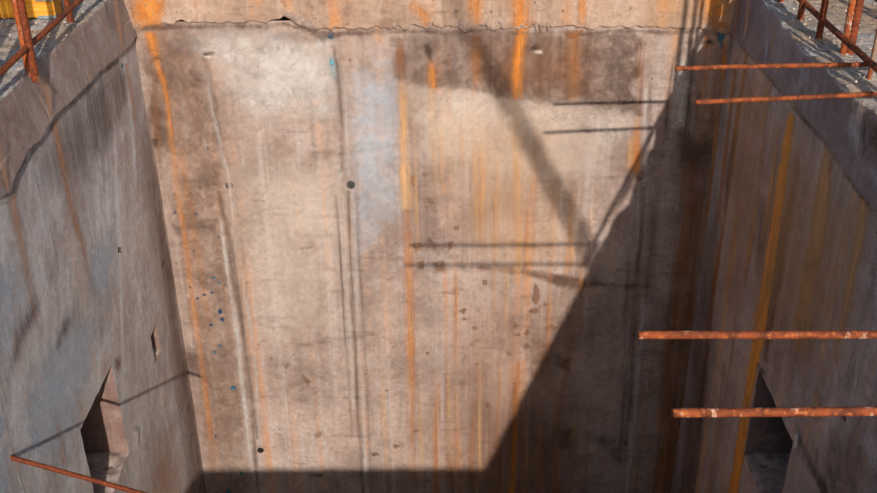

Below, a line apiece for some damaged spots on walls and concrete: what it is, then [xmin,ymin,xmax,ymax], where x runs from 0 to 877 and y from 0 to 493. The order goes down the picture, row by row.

rust [513,0,525,96]
leakage [423,36,641,111]
rust [401,102,410,209]
leakage [500,267,604,313]
rust [728,112,795,493]